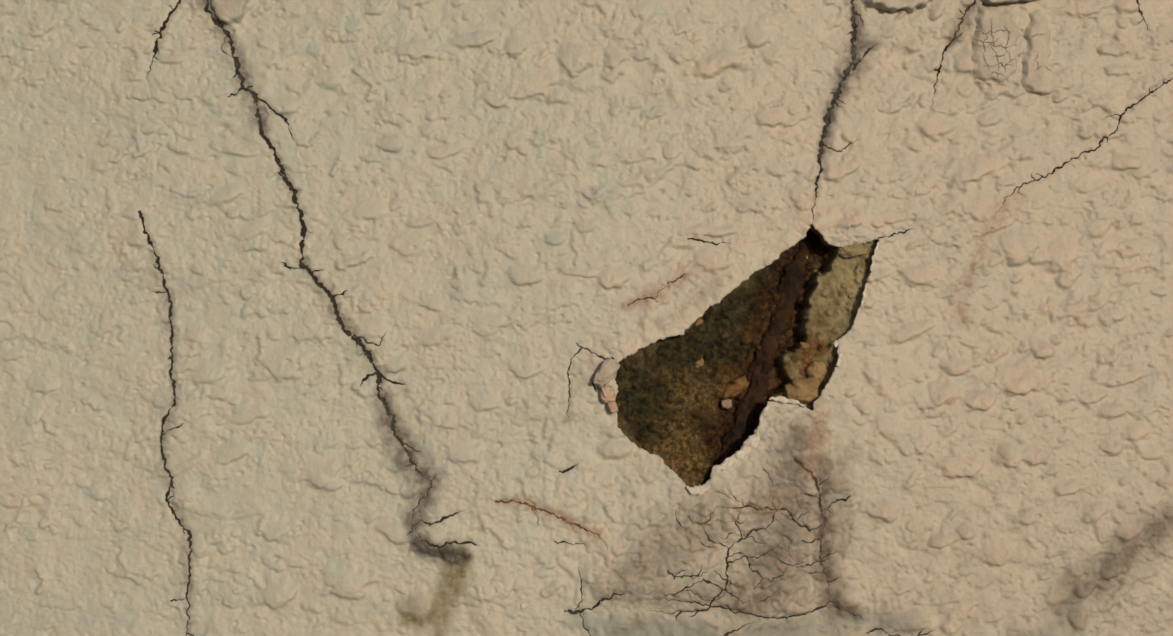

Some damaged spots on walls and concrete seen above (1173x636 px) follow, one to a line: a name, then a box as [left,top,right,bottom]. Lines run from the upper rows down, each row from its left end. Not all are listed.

crack [811,0,874,219]
crack [931,0,976,106]
crack [995,78,1173,214]
crack [146,0,479,558]
crack [627,273,687,306]
crack [688,237,731,245]
crack [138,210,194,636]
crack [566,343,615,425]
spalling [593,229,879,495]
leakage [402,539,470,624]
crack [495,457,932,636]